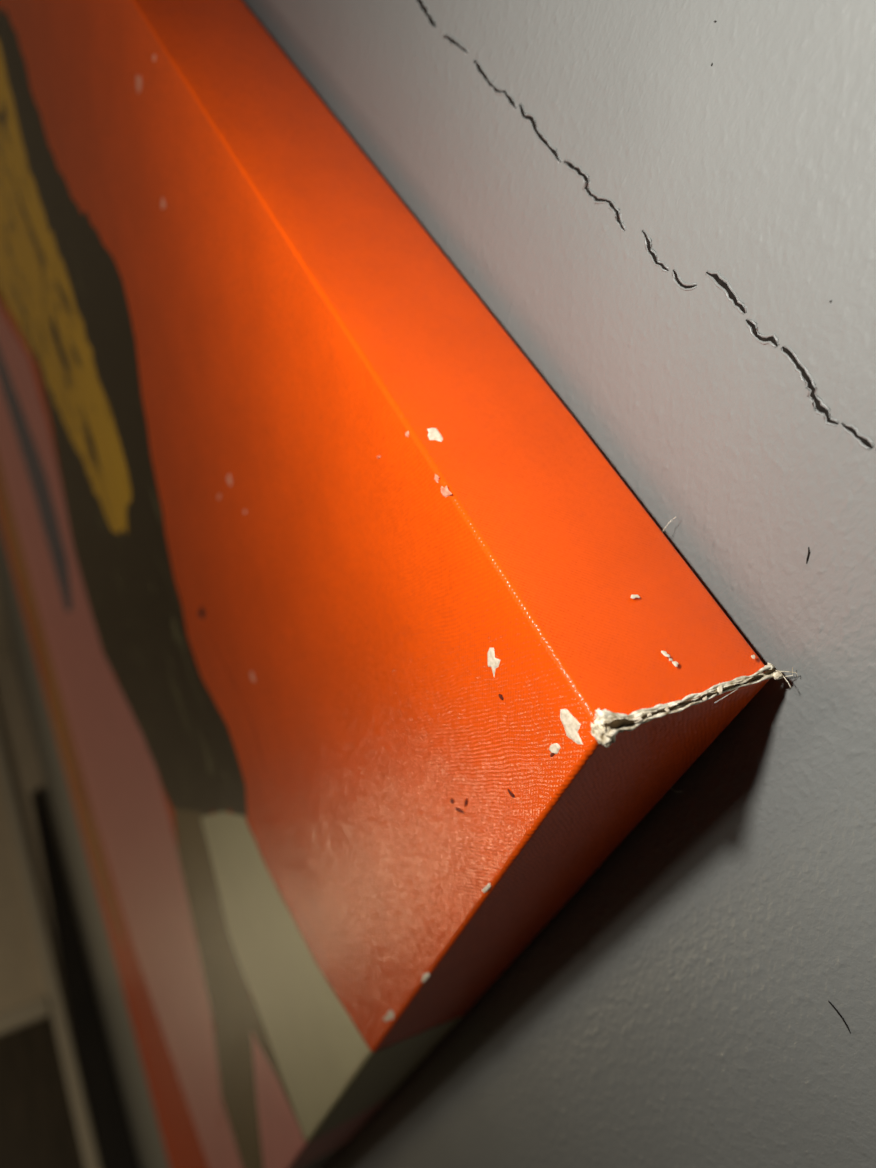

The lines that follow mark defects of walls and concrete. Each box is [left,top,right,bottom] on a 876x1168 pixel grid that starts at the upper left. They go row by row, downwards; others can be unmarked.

crack [414,0,876,452]